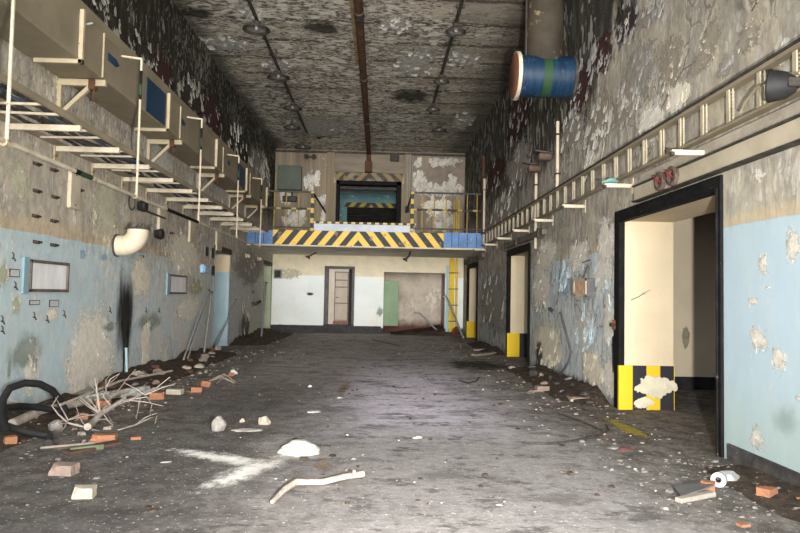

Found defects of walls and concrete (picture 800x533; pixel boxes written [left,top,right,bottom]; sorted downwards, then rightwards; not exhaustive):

damp [180,7,210,18]
damp [304,22,338,33]
damp [393,89,426,102]
peeling [303,170,326,221]
peeling [411,157,465,232]
peeling [786,228,800,264]
peeling [531,217,615,399]
peeling [64,294,116,395]
peeling [750,322,788,376]